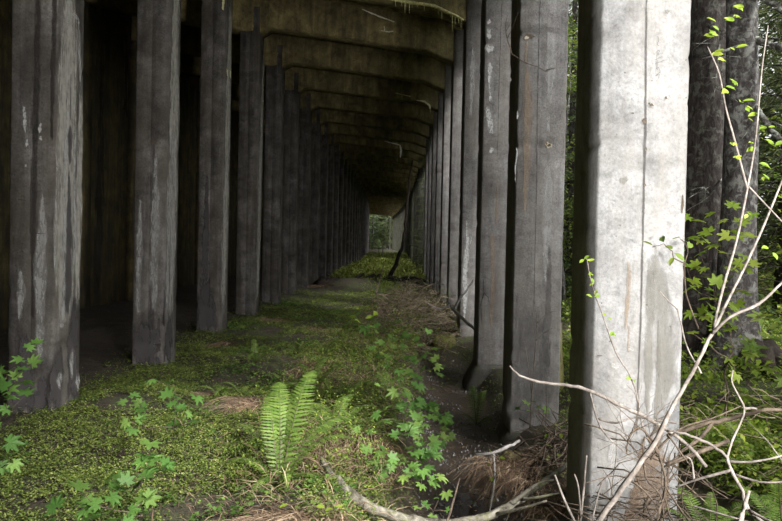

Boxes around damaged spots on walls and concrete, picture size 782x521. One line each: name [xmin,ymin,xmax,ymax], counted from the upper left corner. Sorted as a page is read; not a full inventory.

damp [391,0,464,26]
damp [643,262,674,432]